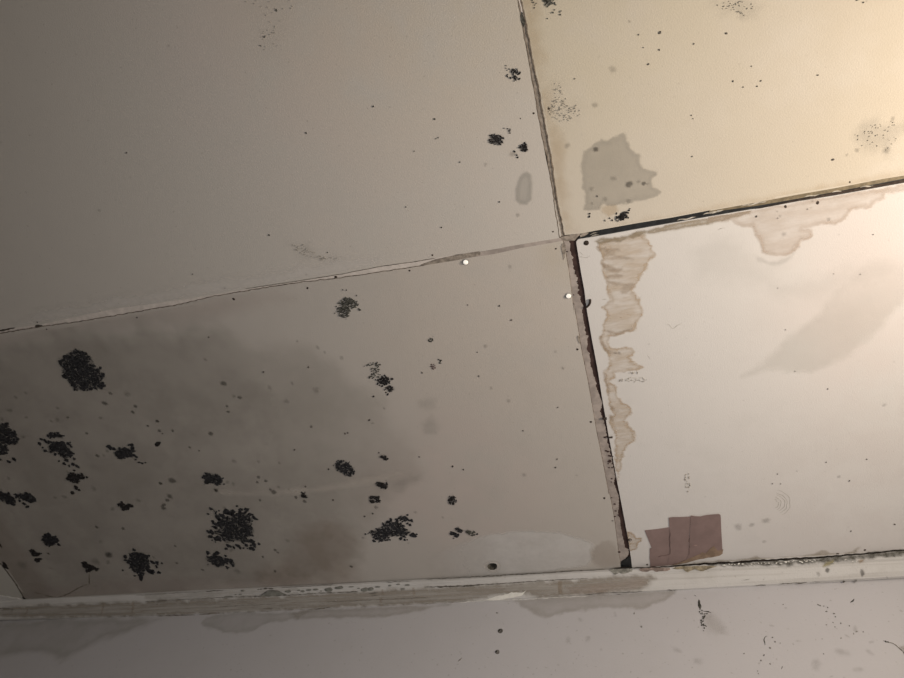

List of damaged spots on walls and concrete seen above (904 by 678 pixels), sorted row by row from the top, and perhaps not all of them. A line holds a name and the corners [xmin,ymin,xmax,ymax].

water stain [334,289,361,318]
water stain [58,349,107,391]
water stain [364,362,394,396]
water stain [38,432,88,495]
water stain [106,443,146,464]
water stain [328,460,355,477]
water stain [0,491,37,508]
water stain [364,482,388,517]
water stain [29,532,61,563]
water stain [206,505,263,570]
water stain [365,514,418,542]
water stain [122,548,163,581]